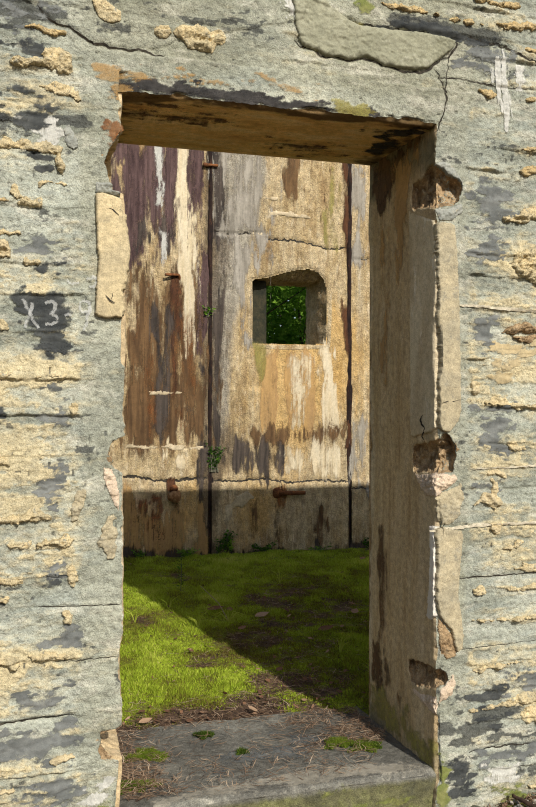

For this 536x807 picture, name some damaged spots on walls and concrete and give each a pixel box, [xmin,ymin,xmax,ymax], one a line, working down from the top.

crack [38,6,164,57]
crack [294,19,536,132]
crack [226,231,345,250]
damp [351,158,387,268]
spalling [412,162,463,221]
damp [111,143,369,529]
crack [123,474,366,489]
spalling [413,434,464,525]
corrosion [123,477,208,556]
damp [313,503,330,550]
spalling [409,659,456,714]